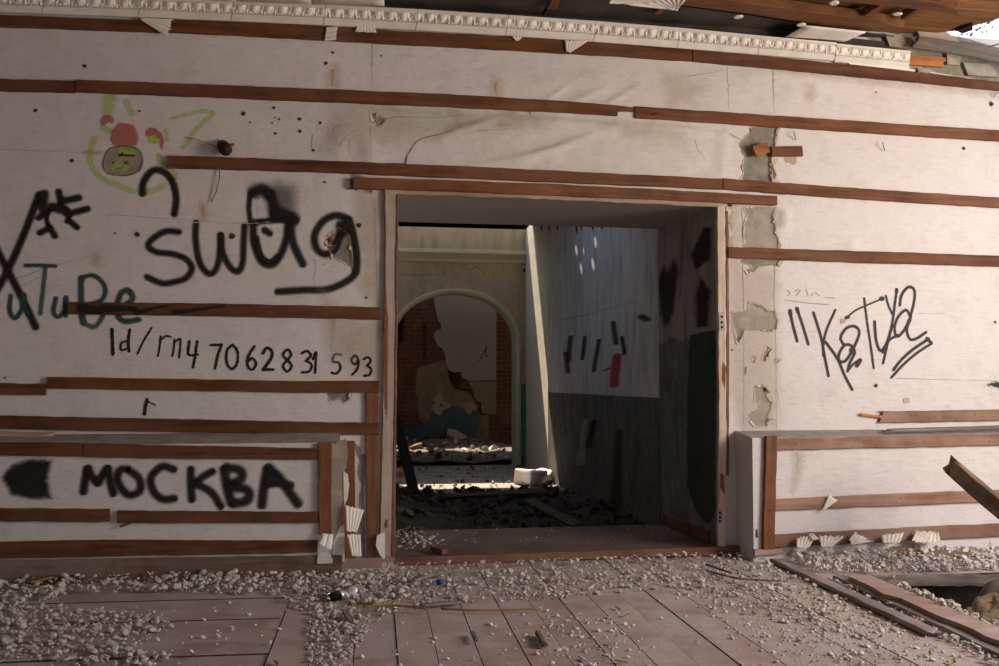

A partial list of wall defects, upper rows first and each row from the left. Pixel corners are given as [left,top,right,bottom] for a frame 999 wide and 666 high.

flaking render [739,126,797,183]
flaking render [726,205,783,275]
flaking render [729,301,778,345]
flaking render [751,346,781,365]
flaking render [748,384,772,427]
peeling [331,439,366,561]